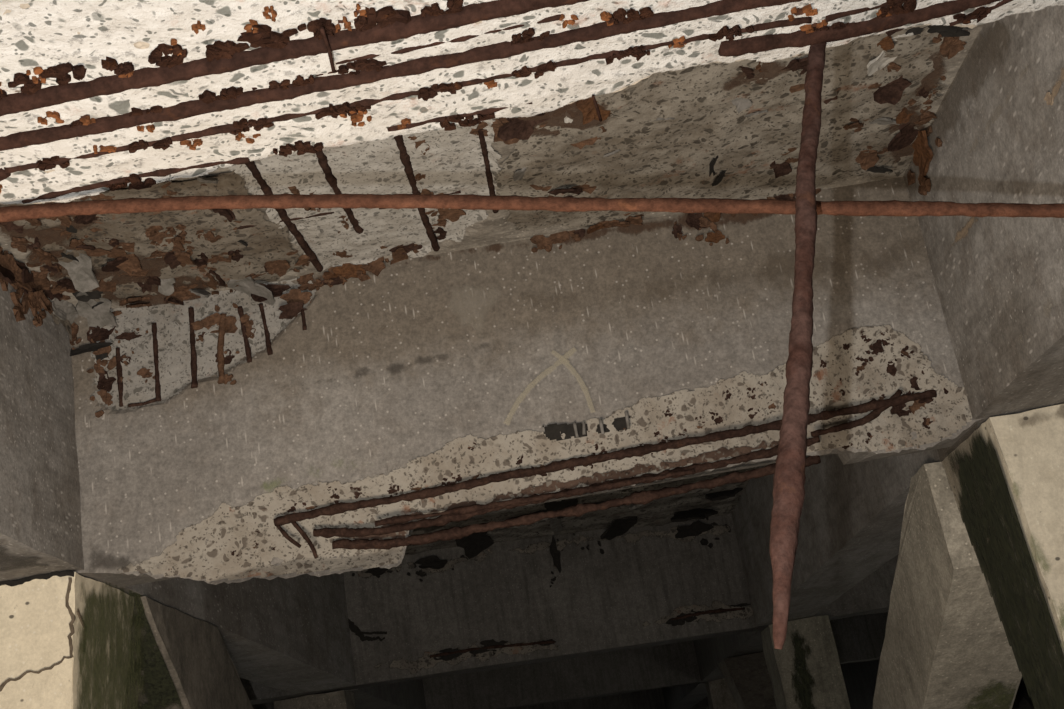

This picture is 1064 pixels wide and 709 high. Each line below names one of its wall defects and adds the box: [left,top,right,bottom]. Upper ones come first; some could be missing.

rust [766,193,796,201]
rust [530,212,772,253]
rust [297,243,440,291]
spalling [117,42,1064,649]
crack [0,571,84,692]